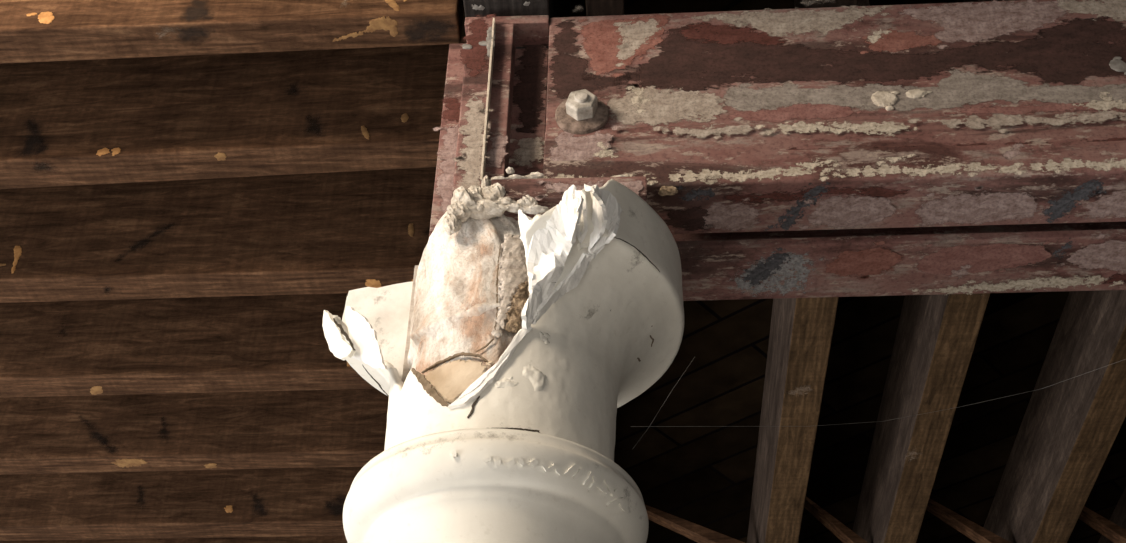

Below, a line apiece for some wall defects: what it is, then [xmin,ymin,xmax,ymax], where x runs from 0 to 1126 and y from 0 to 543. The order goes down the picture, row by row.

peeling [691,0,1126,55]
peeling [425,15,1126,409]
peeling [322,306,388,370]